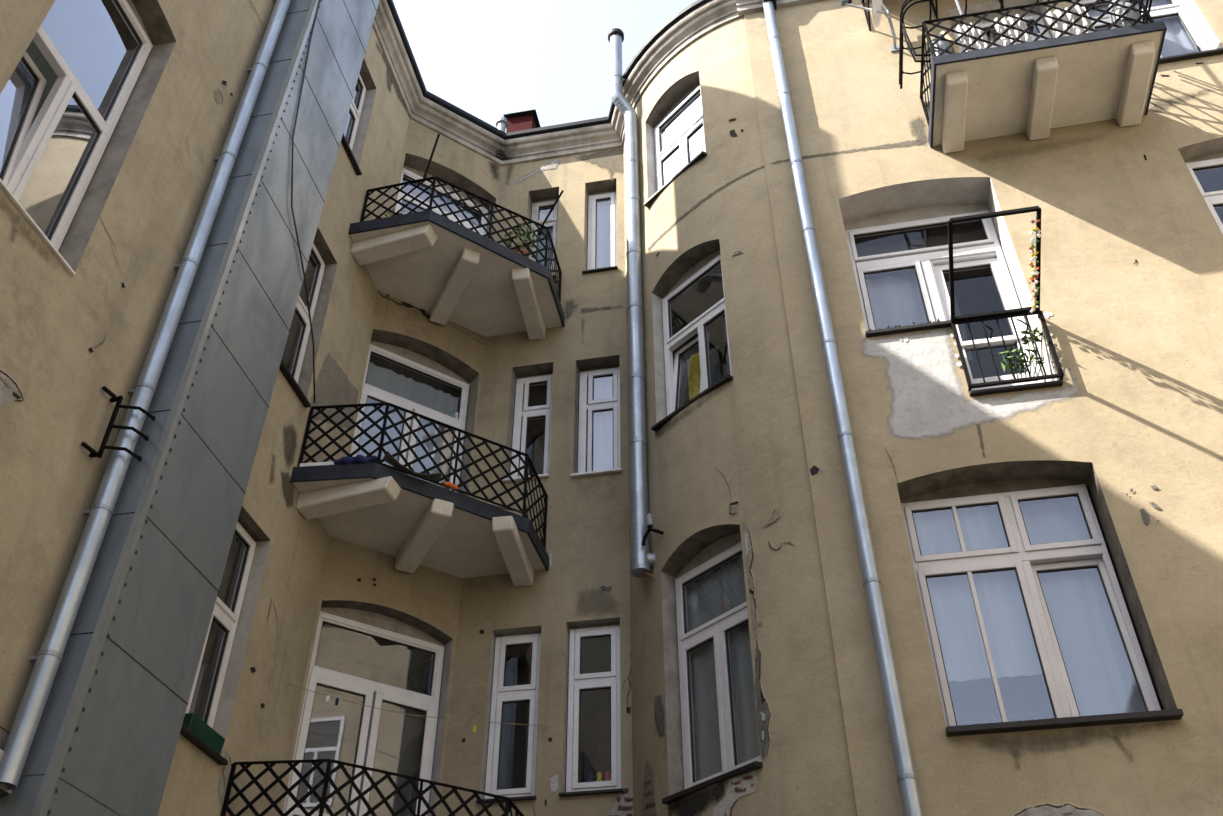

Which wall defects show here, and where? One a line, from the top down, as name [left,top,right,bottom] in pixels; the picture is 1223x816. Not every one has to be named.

peeling [0,368,24,406]
spalling [712,507,795,816]
flaking render [607,759,657,816]
spalling [1012,801,1108,816]